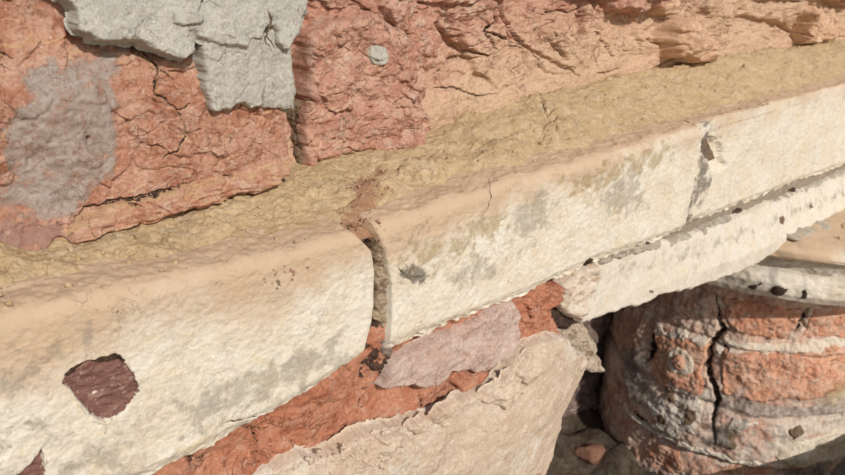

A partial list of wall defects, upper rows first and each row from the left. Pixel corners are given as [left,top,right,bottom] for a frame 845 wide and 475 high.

crack [266,10,274,47]
crack [142,52,190,156]
peeling [700,139,715,161]
crack [75,181,191,217]
crack [703,291,727,442]
peeling [62,353,140,425]
peeling [17,446,48,475]